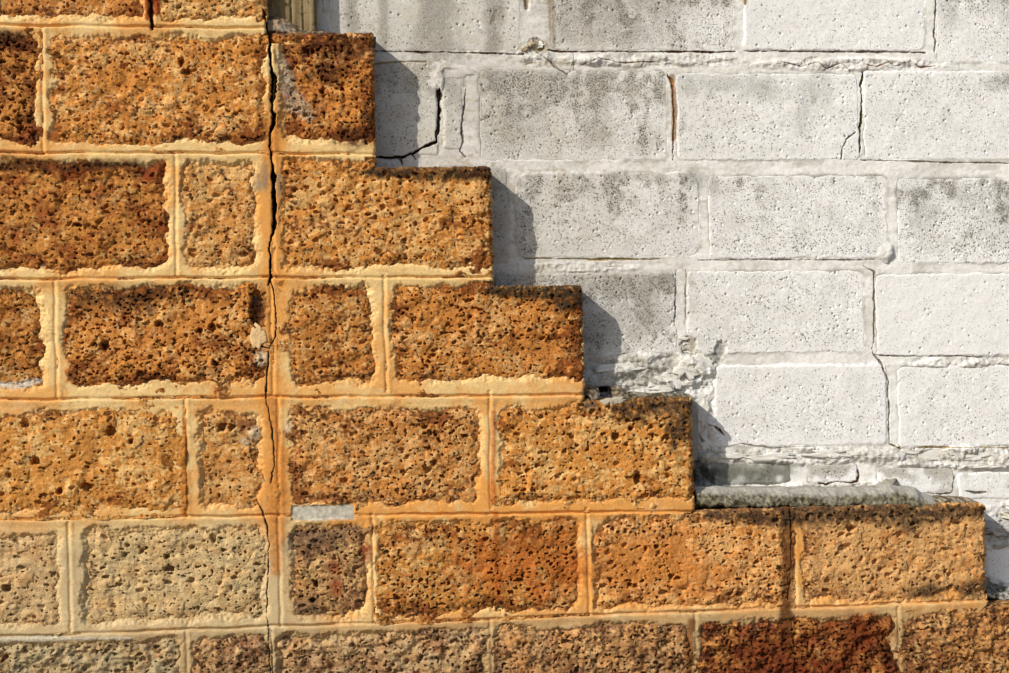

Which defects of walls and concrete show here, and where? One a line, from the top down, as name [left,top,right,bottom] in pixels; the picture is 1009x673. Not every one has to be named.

crack [147,0,155,29]
corrosion [145,0,160,20]
crack [374,0,1005,164]
crack [243,10,278,481]
peeling [594,336,723,393]
peeling [900,447,1007,468]
peeling [984,504,1009,541]
crack [258,503,271,673]